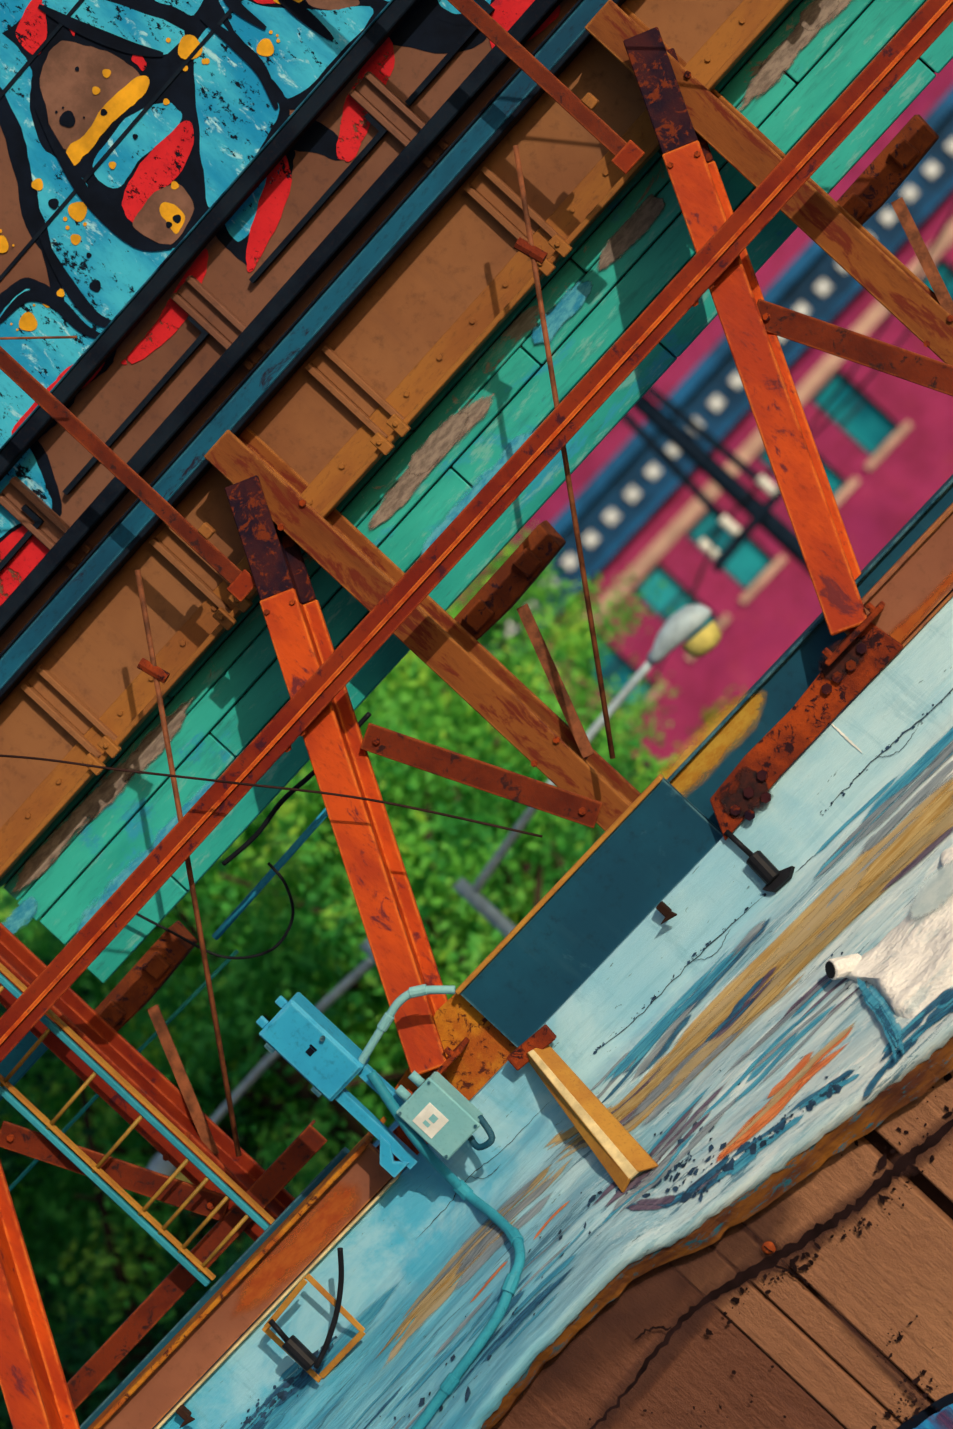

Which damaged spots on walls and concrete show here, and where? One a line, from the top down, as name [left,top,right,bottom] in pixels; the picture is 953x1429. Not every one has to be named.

peeling [738,0,851,110]
peeling [531,194,665,343]
peeling [369,394,494,529]
corrosion [819,636,867,680]
corrosion [661,694,763,794]
corrosion [720,767,773,818]
crack [417,1102,549,1238]
corrosion [238,1187,355,1310]
crack [590,1117,953,1429]